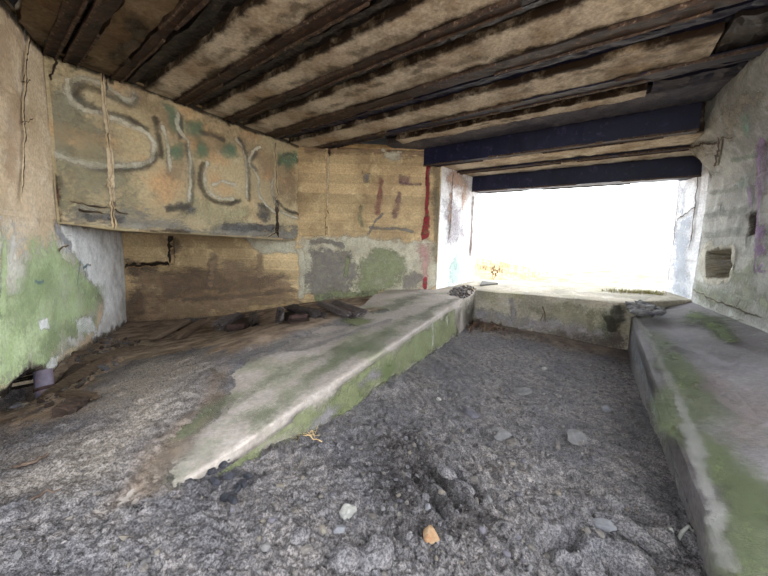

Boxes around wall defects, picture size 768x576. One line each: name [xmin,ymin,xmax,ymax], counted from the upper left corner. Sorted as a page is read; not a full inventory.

water stain [0,88,378,383]
crack [125,236,173,269]
crack [693,288,763,318]